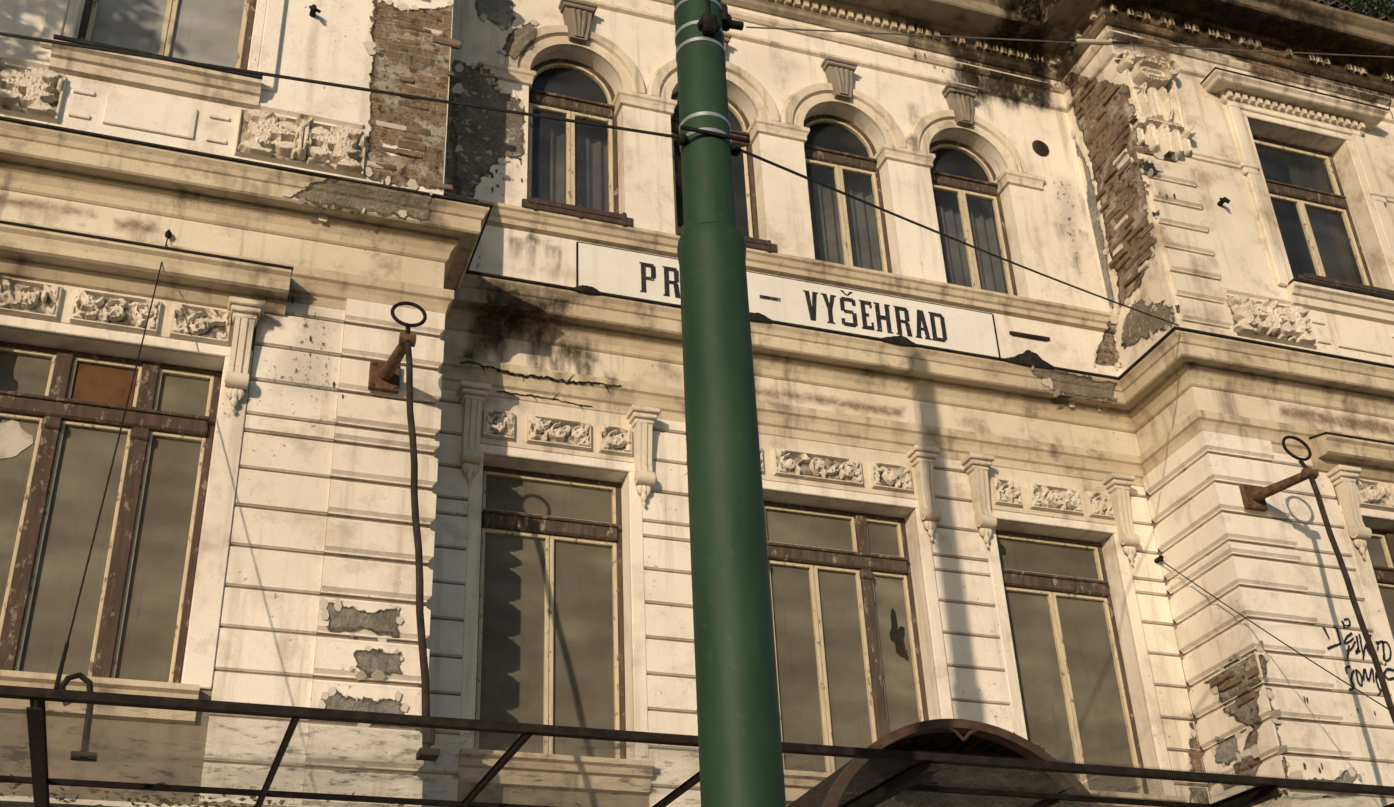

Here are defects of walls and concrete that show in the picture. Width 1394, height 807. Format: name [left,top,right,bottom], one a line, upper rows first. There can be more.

spalling [362,0,525,201]
spalling [475,0,539,59]
leakage [909,3,1054,109]
spalling [1064,72,1180,371]
leakage [471,282,591,373]
crack [460,361,622,407]
peeling [1031,365,1076,407]
spalling [318,597,409,727]
spalling [1186,640,1362,804]